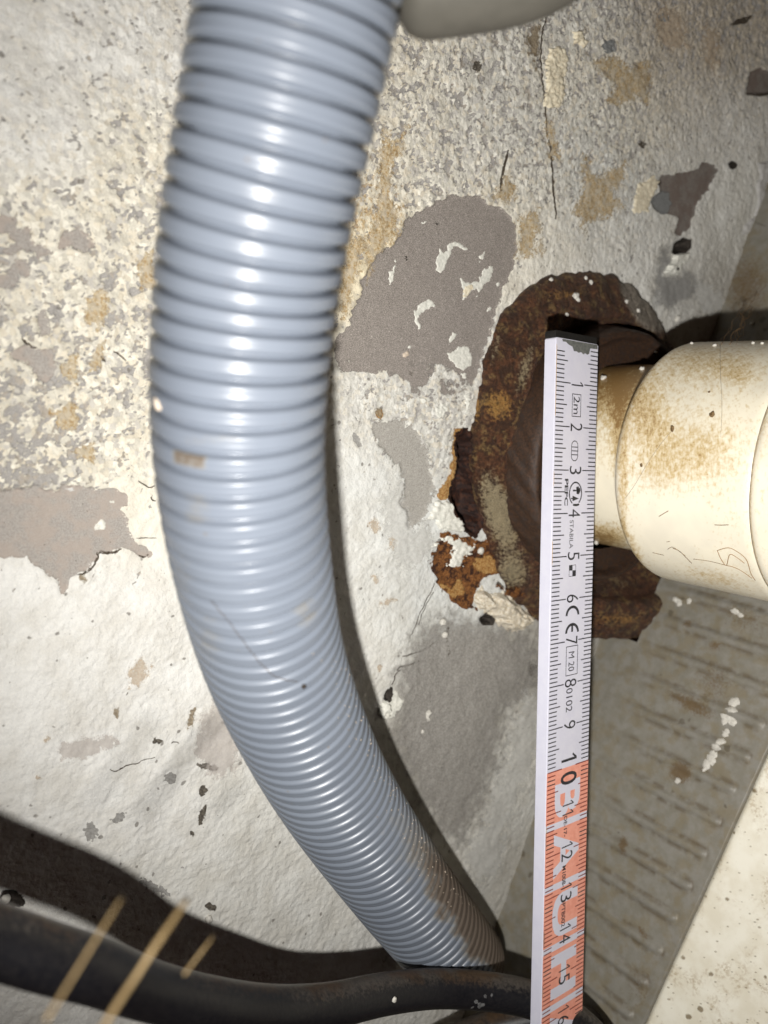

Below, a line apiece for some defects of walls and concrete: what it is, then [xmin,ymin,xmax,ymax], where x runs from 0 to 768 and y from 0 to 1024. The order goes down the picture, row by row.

crack [540,18,557,219]
peeling [632,162,718,277]
peeling [334,194,518,418]
peeling [371,410,484,538]
peeling [0,484,152,594]
corrosion [430,531,525,611]